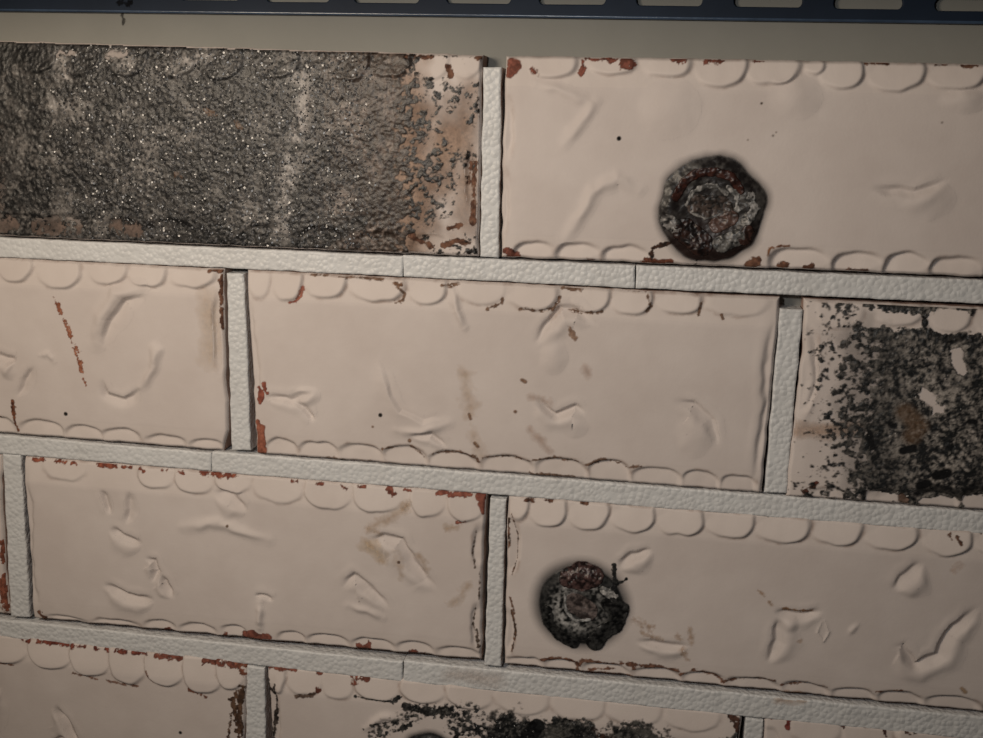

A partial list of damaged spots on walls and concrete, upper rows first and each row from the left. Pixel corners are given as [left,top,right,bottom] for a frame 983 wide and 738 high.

spalling [408,161,478,249]
spalling [517,719,545,738]
spalling [728,715,741,736]